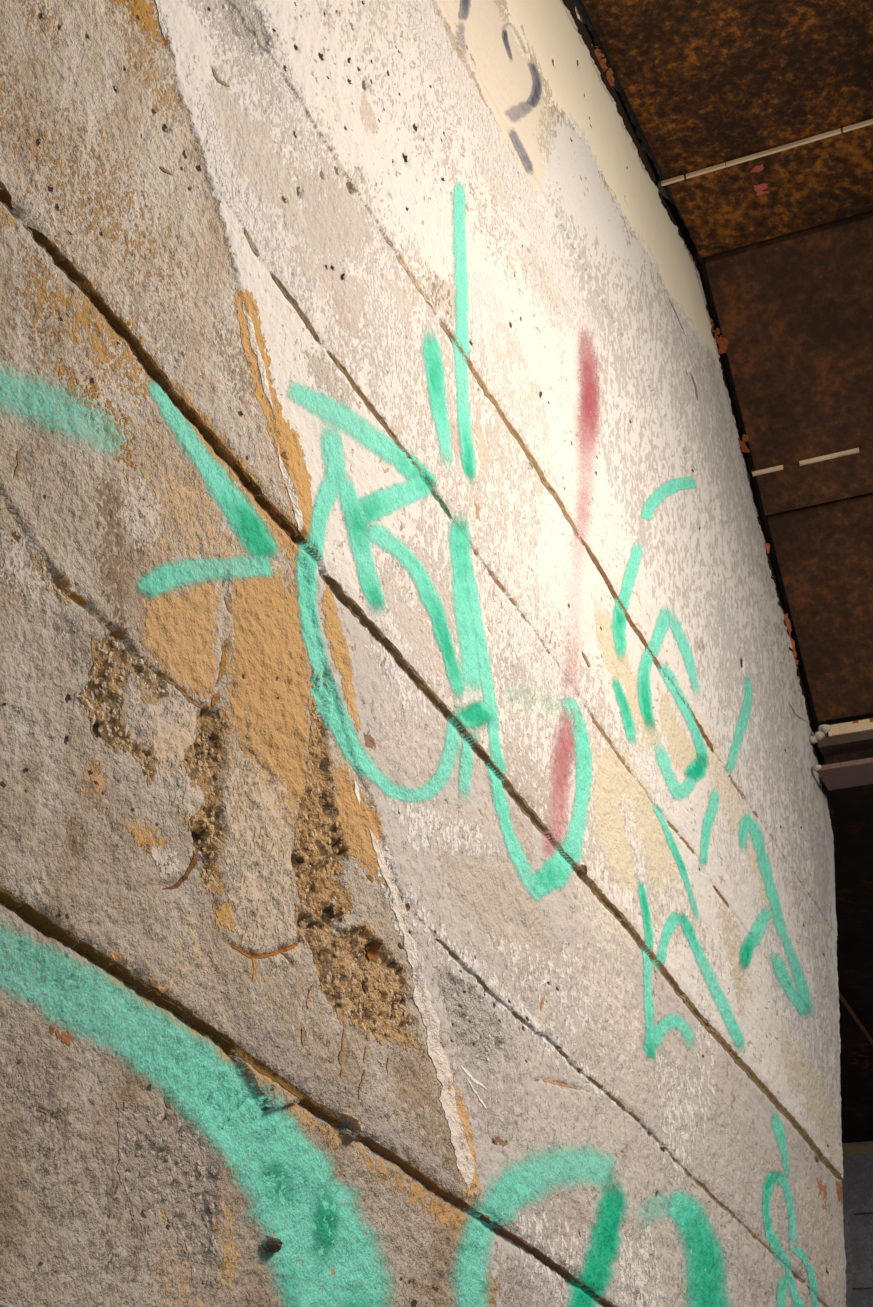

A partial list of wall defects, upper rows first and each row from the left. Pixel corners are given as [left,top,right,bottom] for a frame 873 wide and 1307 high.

rust [585,33,615,87]
spalling [75,627,169,788]
crack [62,588,226,713]
crack [0,181,304,544]
crack [140,847,197,889]
spalling [184,701,229,905]
crack [243,228,453,519]
crack [388,241,759,818]
crack [322,575,843,1180]
crack [562,0,834,819]
crack [0,886,618,1307]
crack [672,1157,873,1307]